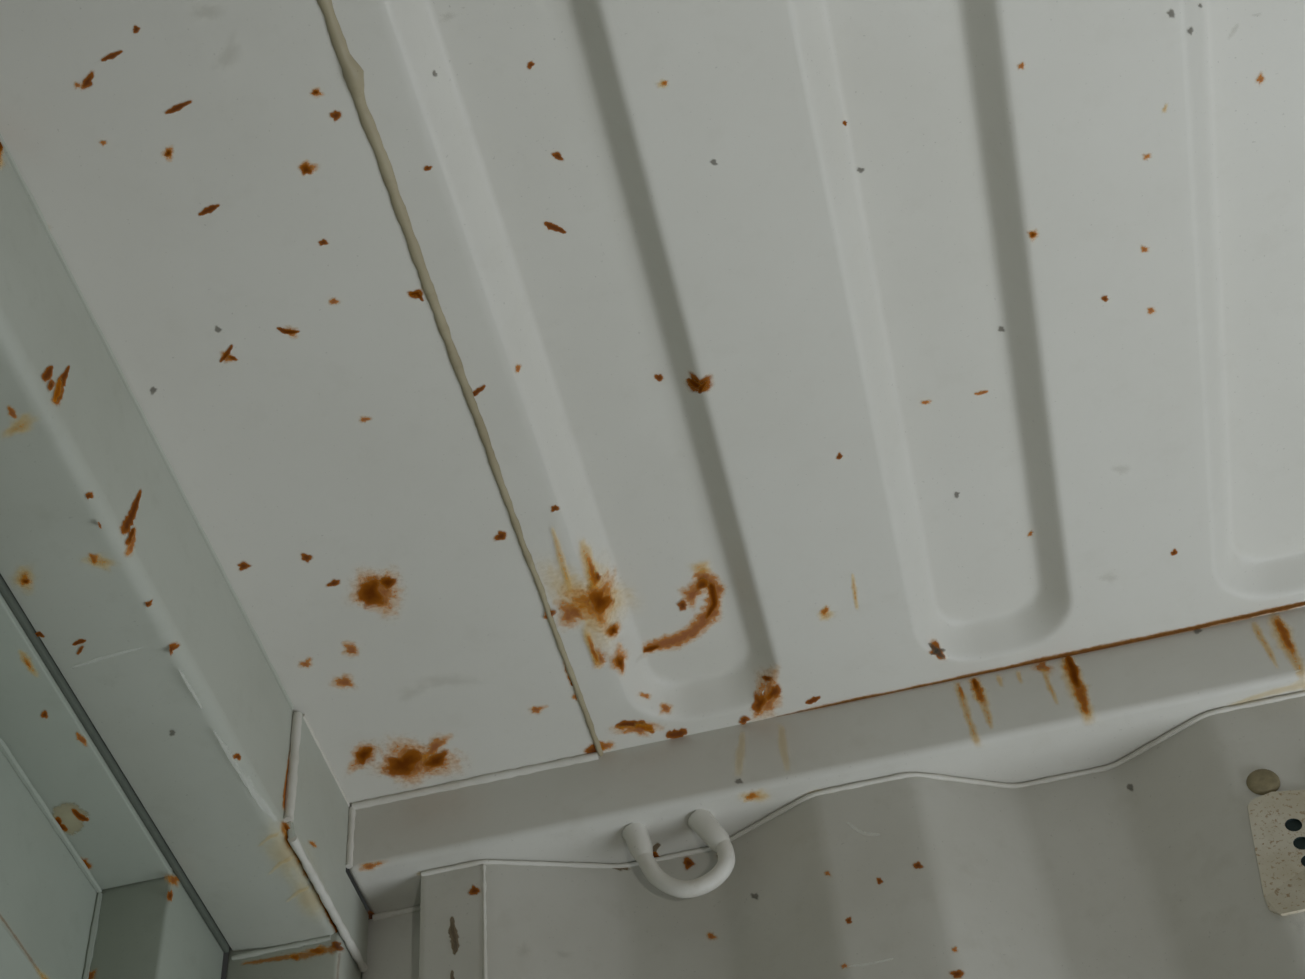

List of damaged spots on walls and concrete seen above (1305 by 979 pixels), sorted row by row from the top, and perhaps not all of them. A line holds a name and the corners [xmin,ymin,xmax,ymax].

rust [357,576,397,609]
rust [544,557,627,672]
rust [643,570,724,653]
rust [739,602,1305,725]
rust [351,738,448,779]
rust [585,720,687,754]
rust [282,760,308,876]
rust [244,893,344,964]